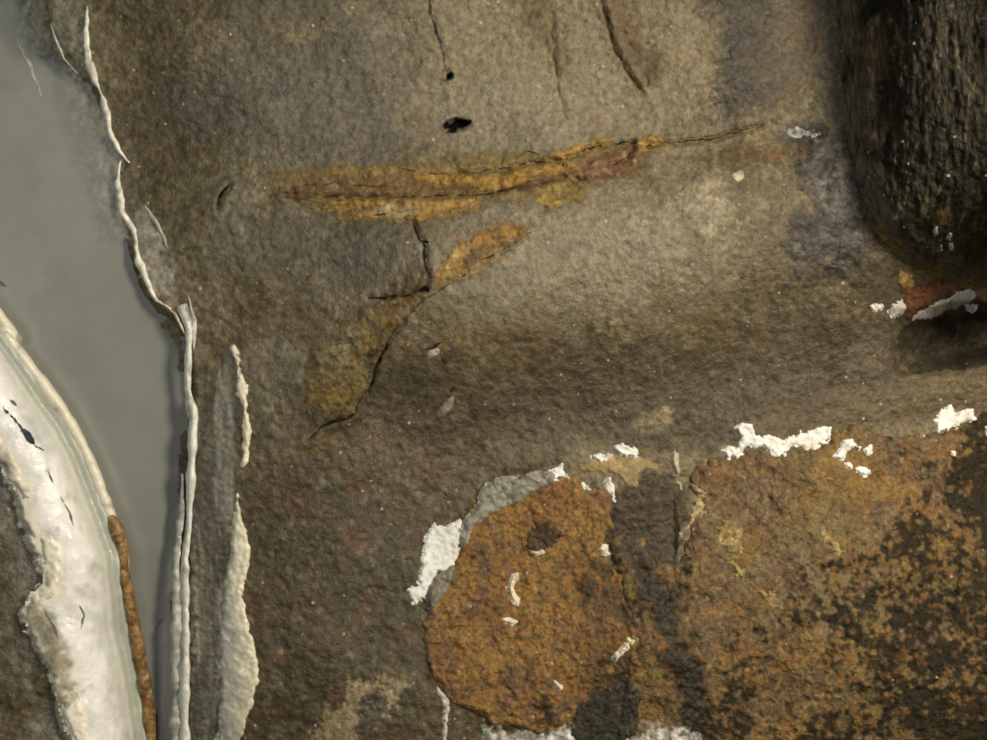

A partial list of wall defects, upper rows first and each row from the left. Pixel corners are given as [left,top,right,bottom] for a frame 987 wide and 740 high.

crack [429,0,448,71]
crack [601,0,642,95]
peeling [49,6,197,349]
corrosion [299,222,530,417]
corrosion [268,134,672,227]
crack [284,127,760,440]
peeling [870,289,976,321]
damp [933,226,954,251]
corrosion [107,515,156,740]
corrosion [421,465,642,735]